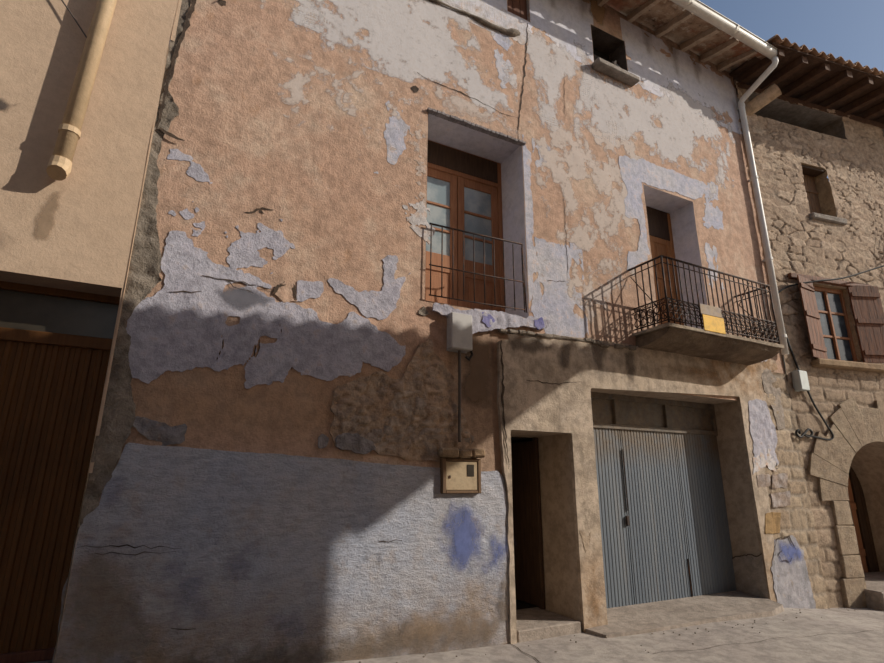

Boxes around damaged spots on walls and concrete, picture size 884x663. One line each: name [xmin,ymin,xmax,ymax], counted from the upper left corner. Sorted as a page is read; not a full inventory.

crack [417,23,528,138]
peeling [273,0,743,338]
crack [174,275,297,300]
peeling [79,0,411,526]
crack [500,340,509,469]
crack [77,544,181,556]
damp [446,508,479,567]
peeling [732,360,816,609]